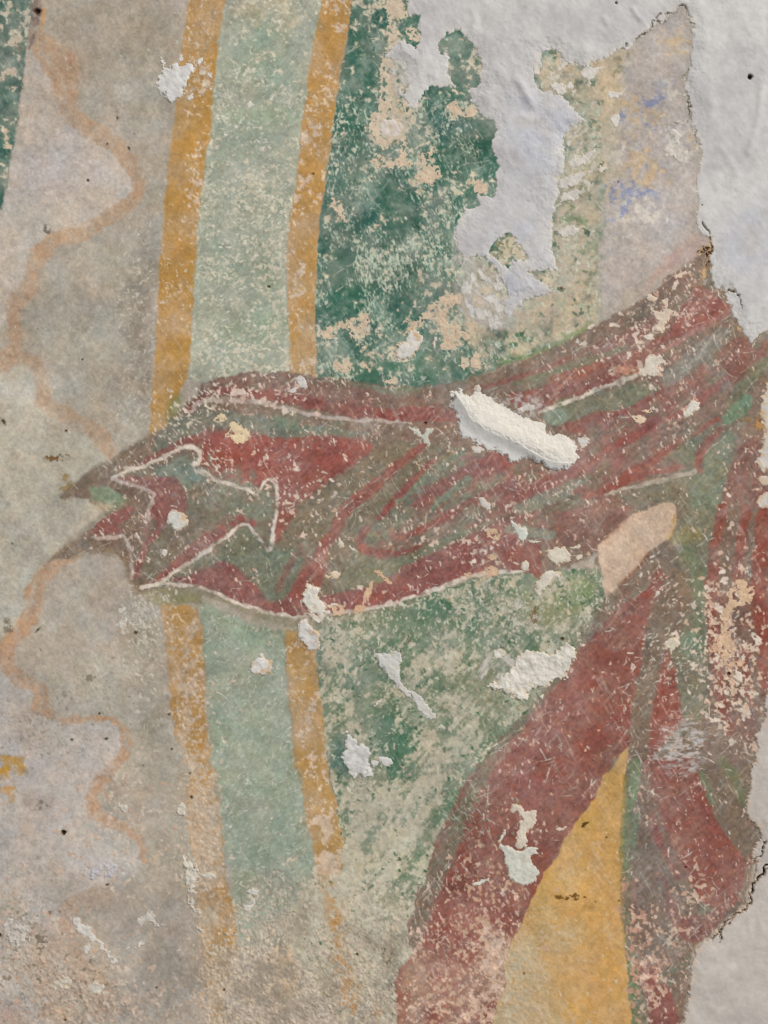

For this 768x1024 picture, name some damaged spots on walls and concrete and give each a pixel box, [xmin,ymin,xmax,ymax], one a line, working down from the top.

flaking render [368,0,768,343]
flaking render [637,354,665,377]
flaking render [297,570,392,651]
peeling [366,756,393,777]
flaking render [498,803,537,849]
crack [712,841,768,940]